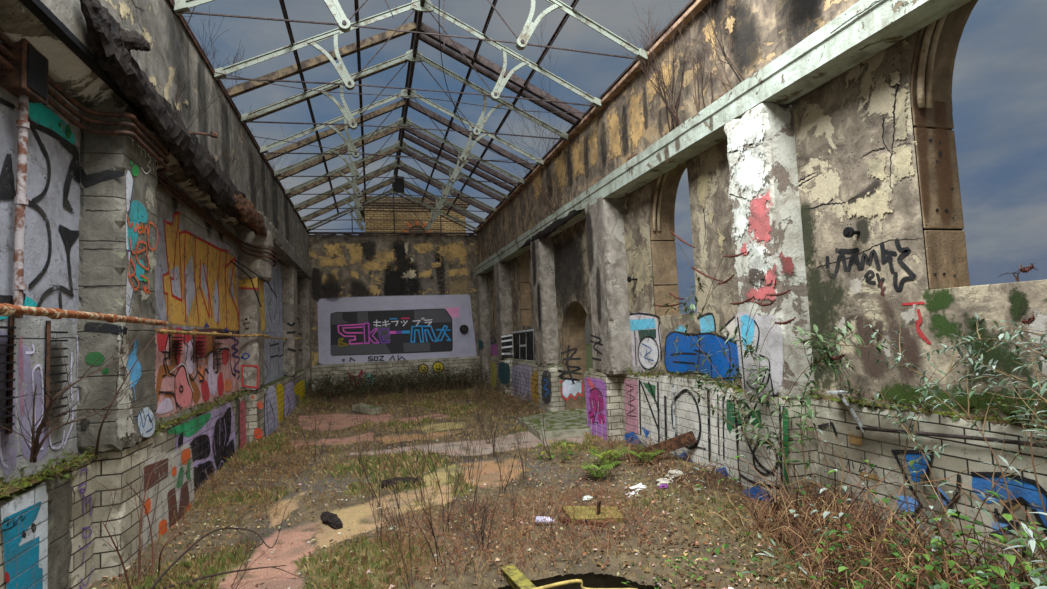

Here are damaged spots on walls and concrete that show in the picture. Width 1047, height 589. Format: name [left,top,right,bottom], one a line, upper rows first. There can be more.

peeling [703,17,735,47]
water stain [709,0,760,71]
water stain [777,0,821,42]
crack [859,74,911,193]
peeling [695,111,795,302]
spalling [317,240,471,295]